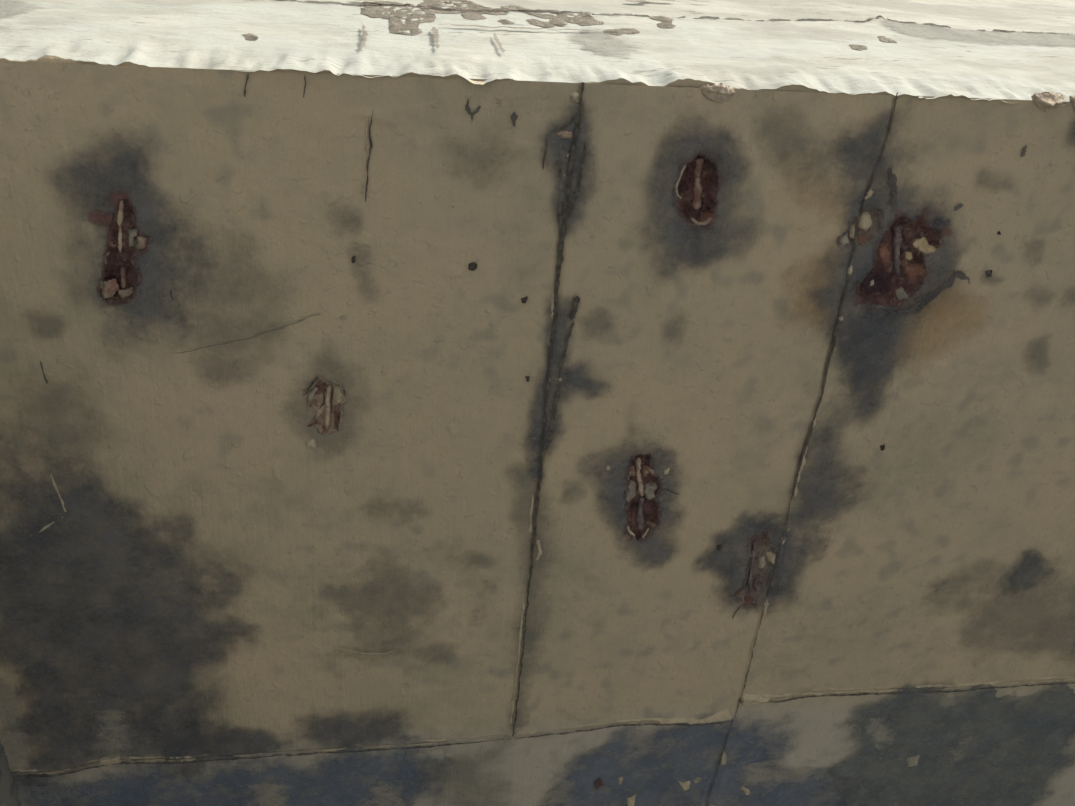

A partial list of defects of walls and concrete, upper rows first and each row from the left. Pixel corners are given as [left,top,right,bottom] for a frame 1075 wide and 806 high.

spalling [1031,92,1075,113]
water stain [57,152,180,328]
spalling [88,192,151,305]
spalling [673,153,719,227]
spalling [837,206,951,308]
crack [509,82,587,737]
water stain [593,449,677,564]
spalling [624,454,680,541]
water stain [699,433,851,609]
crack [707,92,898,806]
water stain [0,478,450,806]
water stain [548,683,1075,806]